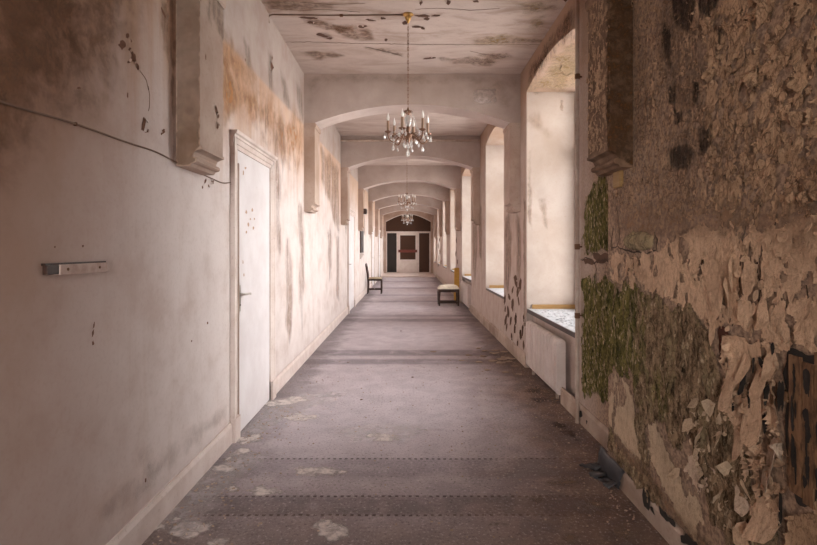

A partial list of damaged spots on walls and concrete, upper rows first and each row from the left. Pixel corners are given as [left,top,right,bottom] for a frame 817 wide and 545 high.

peeling [118,33,140,71]
peeling [402,0,442,30]
water stain [662,0,718,68]
water stain [670,129,711,169]
peeling [581,0,817,545]
peeling [504,275,525,350]